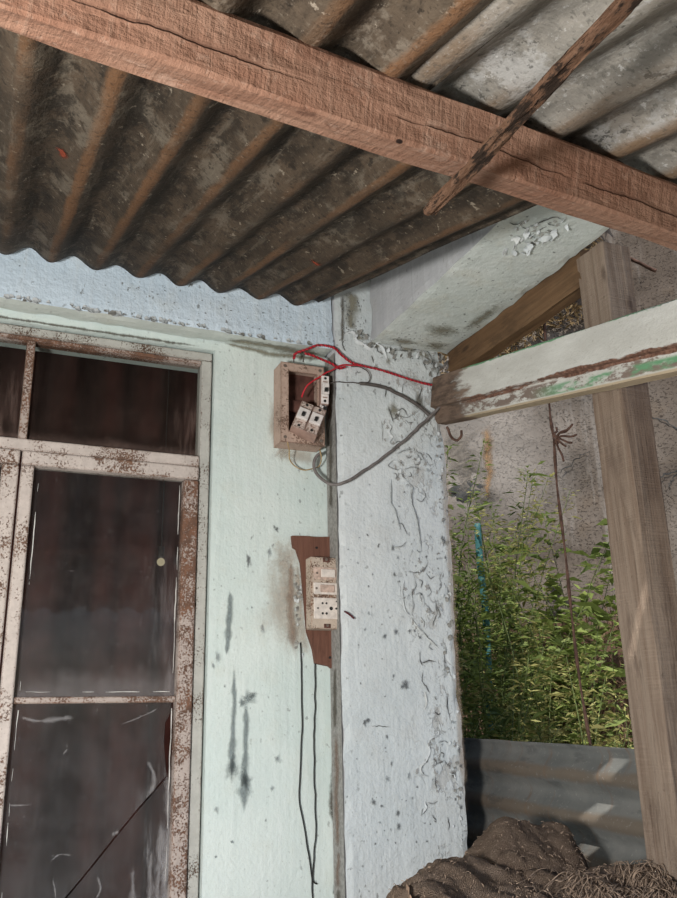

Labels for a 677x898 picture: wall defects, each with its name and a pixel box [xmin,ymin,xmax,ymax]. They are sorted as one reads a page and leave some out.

peeling [502,217,569,256]
leakage [213,595,232,667]
peeling [401,566,453,655]
leakage [224,679,255,806]